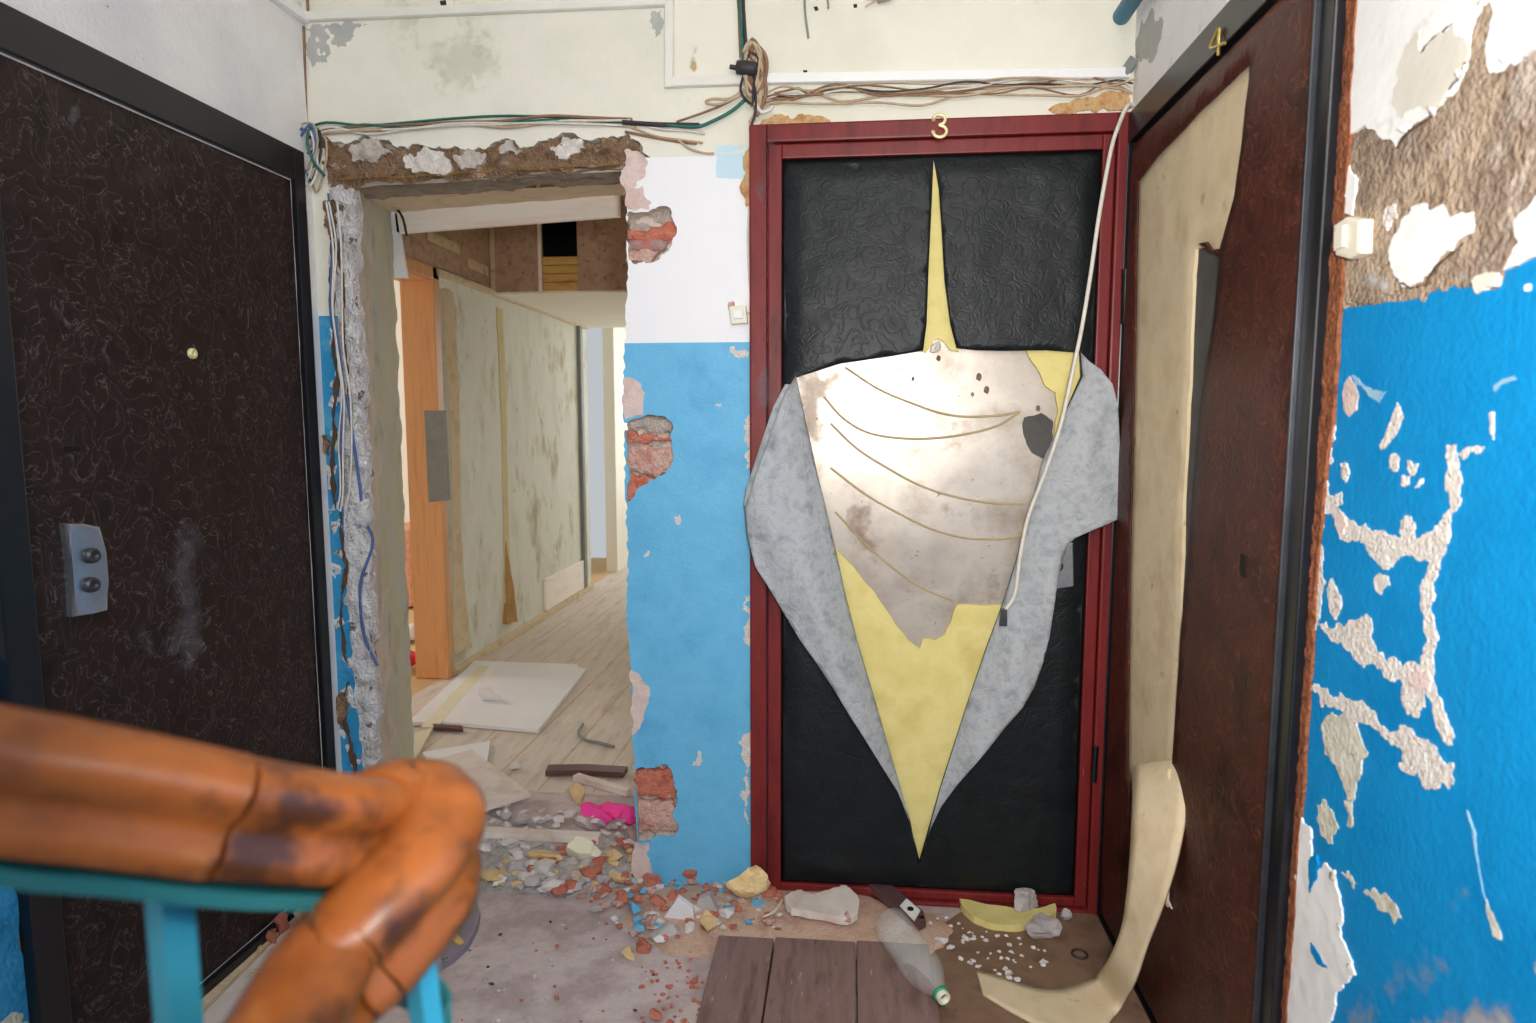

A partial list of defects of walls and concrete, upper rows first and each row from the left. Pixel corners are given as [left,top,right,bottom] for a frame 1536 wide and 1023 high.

spalling [1342,0,1536,310]
spalling [313,135,677,774]
spalling [631,764,679,886]
peeling [1287,375,1495,1023]
peeling [1486,899,1502,940]